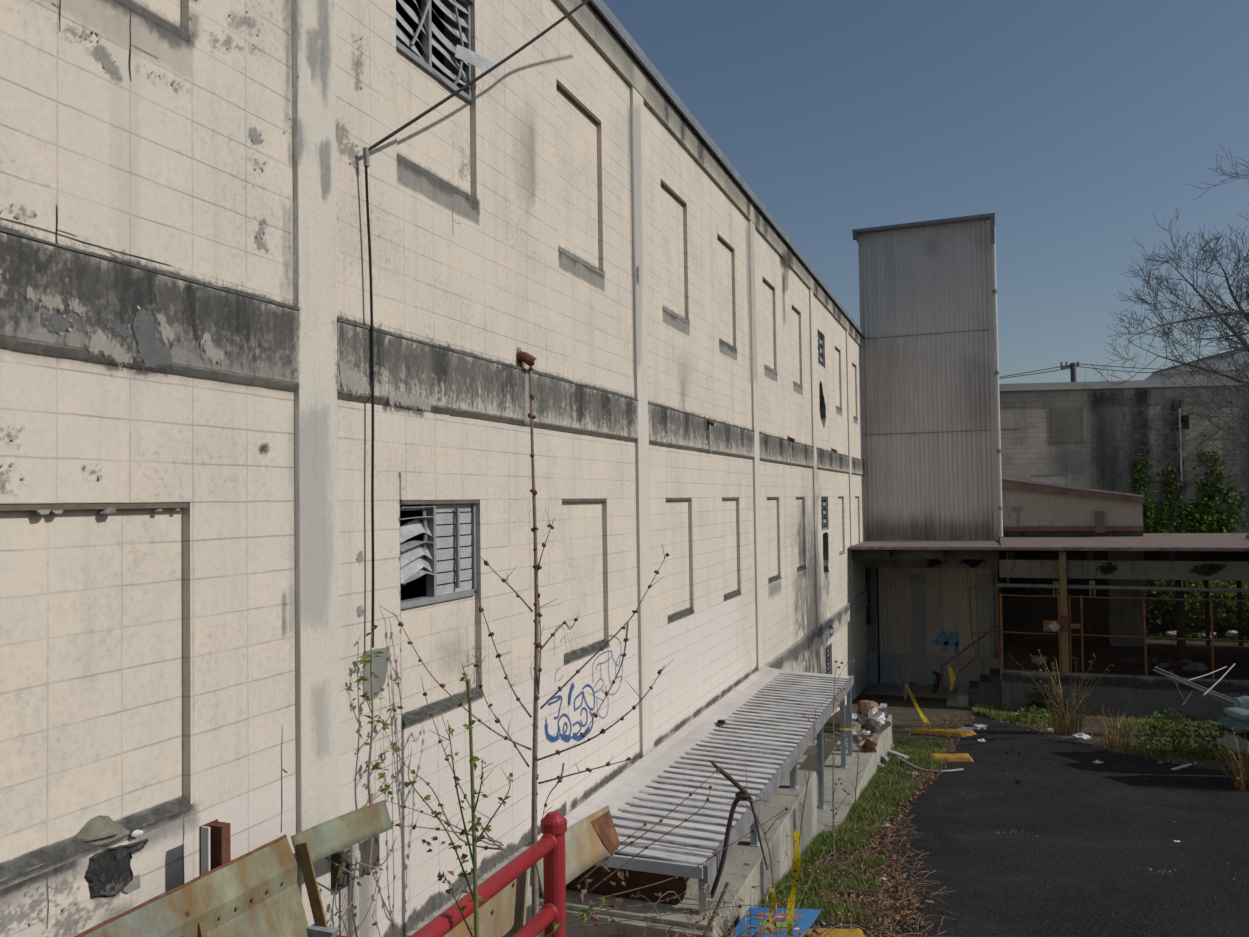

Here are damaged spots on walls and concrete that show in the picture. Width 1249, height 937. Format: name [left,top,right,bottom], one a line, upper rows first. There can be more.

peeling [27,286,176,371]
water stain [0,225,299,369]
peeling [201,332,223,365]
water stain [337,315,865,472]
water stain [1089,390,1186,518]
spalling [0,830,148,937]